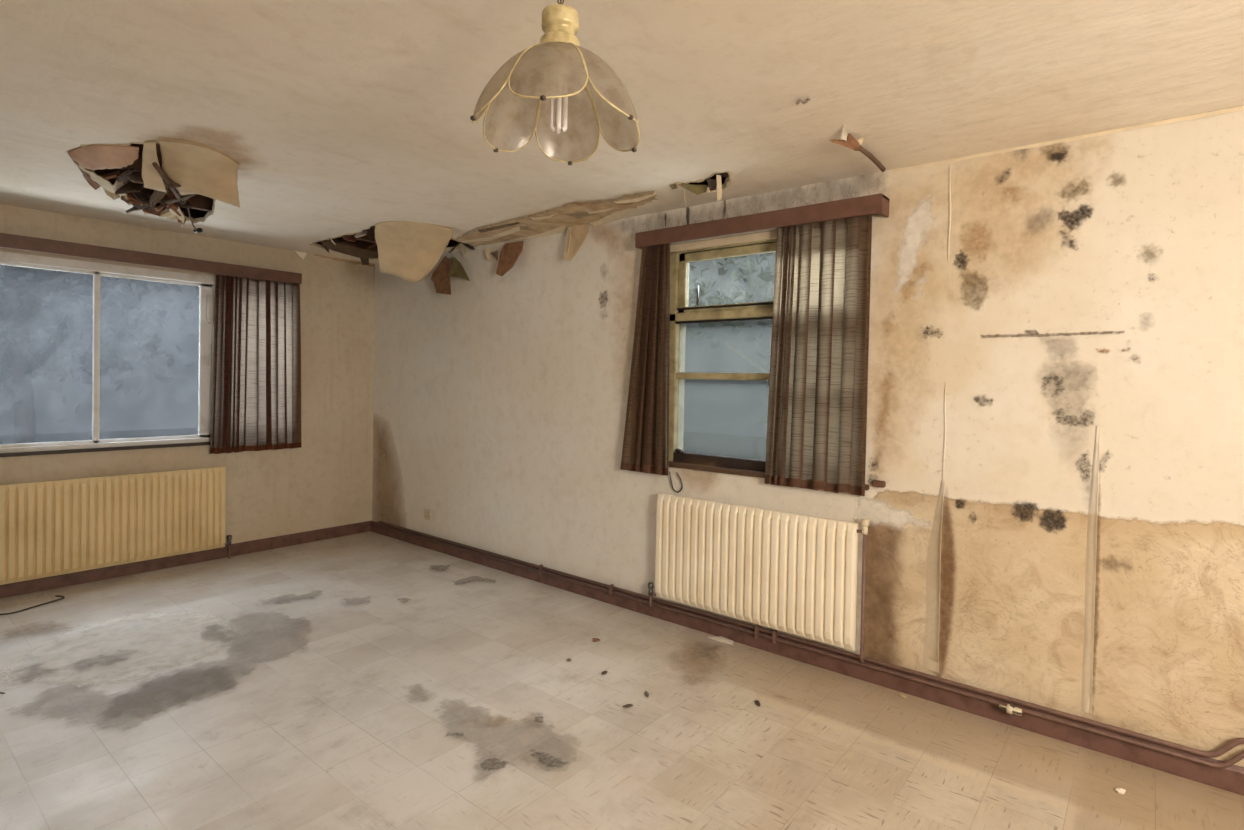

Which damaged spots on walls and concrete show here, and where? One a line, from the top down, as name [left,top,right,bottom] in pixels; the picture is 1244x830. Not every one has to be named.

water stain [1059,187,1092,248]
peeling [896,201,932,299]
water stain [956,253,987,304]
crack [981,330,1124,338]
peeling [855,498,928,528]
flaking render [939,506,954,669]
water stain [11,612,229,687]